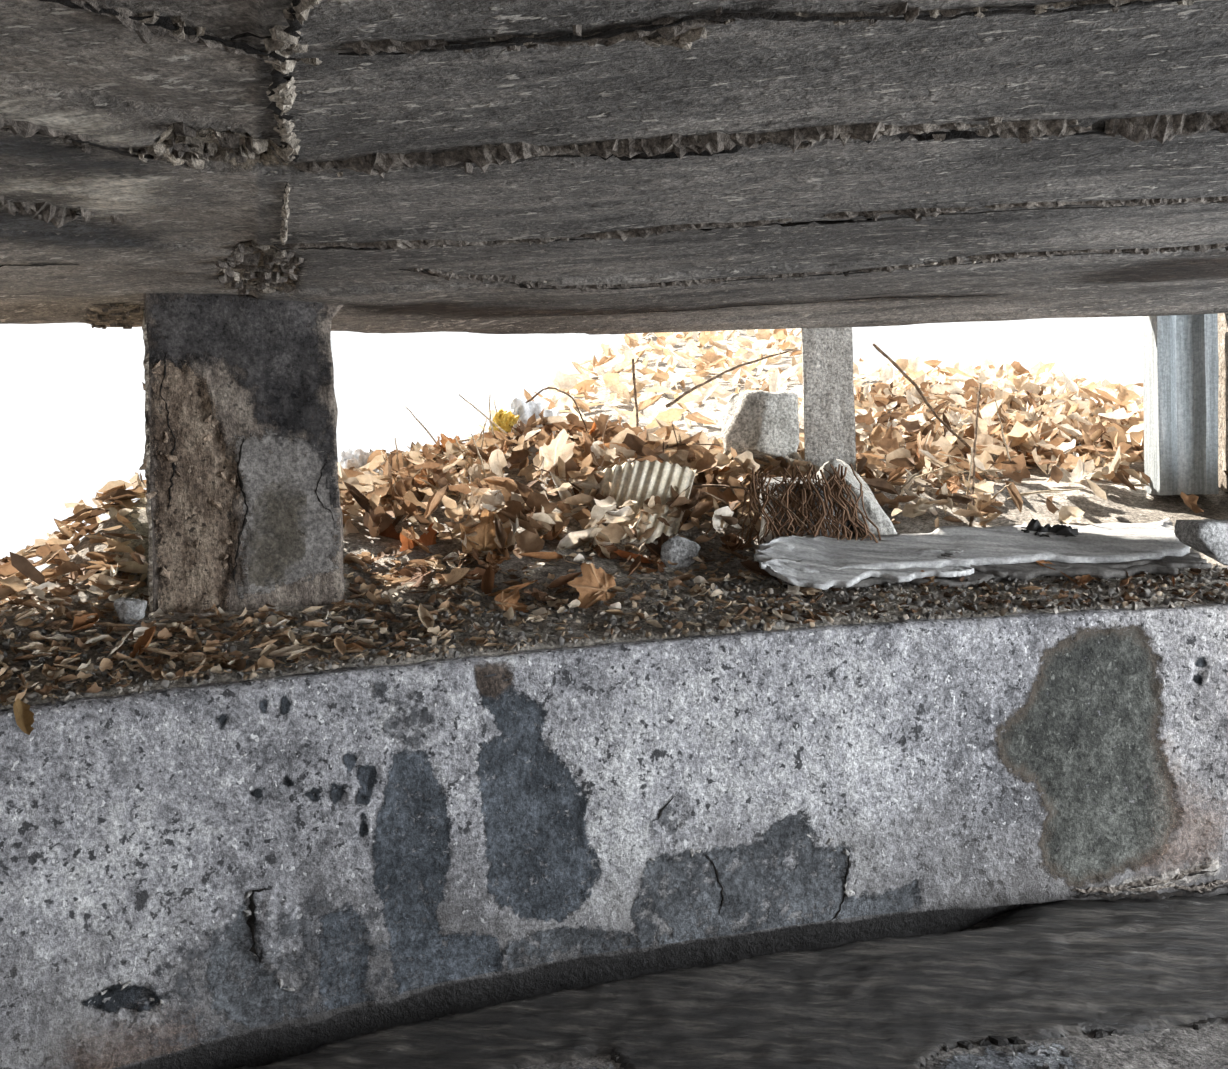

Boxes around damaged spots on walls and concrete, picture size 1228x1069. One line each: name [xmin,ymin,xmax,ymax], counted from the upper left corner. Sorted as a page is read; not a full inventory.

crack [0,261,79,269]
crack [0,195,127,228]
crack [0,114,163,163]
crack [39,0,1228,292]
leakage [134,662,641,1053]
leakage [993,624,1183,890]